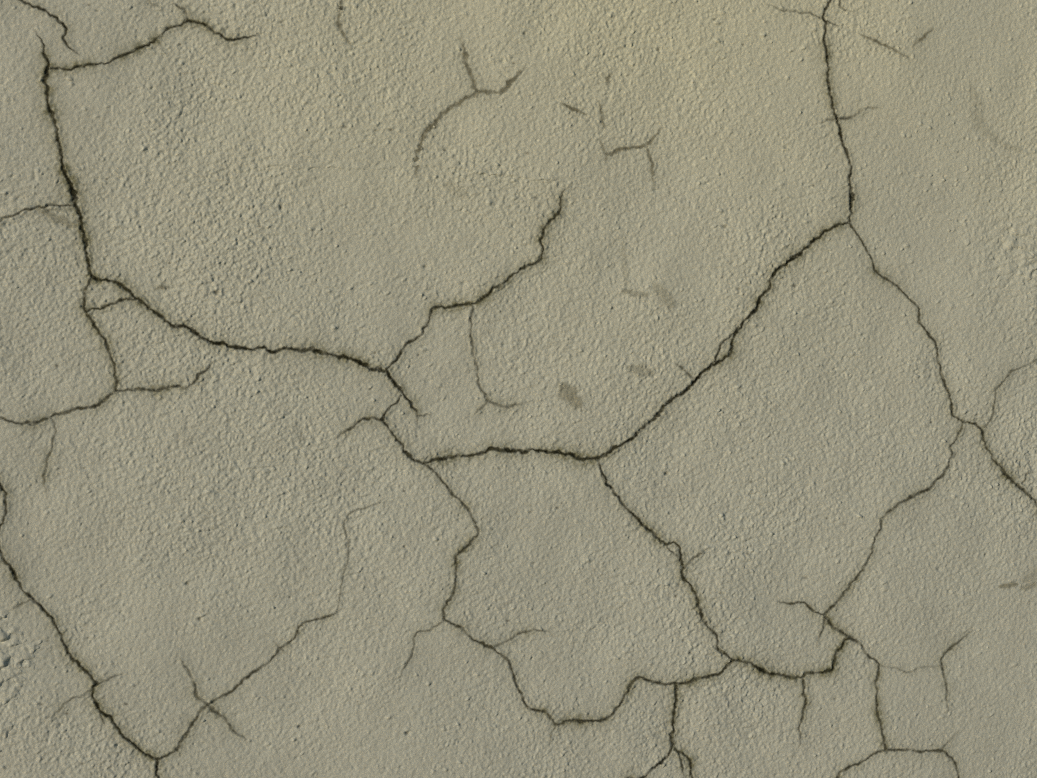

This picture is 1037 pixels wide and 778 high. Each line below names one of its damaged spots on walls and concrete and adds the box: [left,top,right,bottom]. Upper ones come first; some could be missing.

crack [21,0,72,50]
crack [414,52,517,162]
crack [2,20,497,510]
crack [463,0,1036,778]
crack [455,518,478,568]
crack [0,483,334,778]
crack [442,578,461,628]